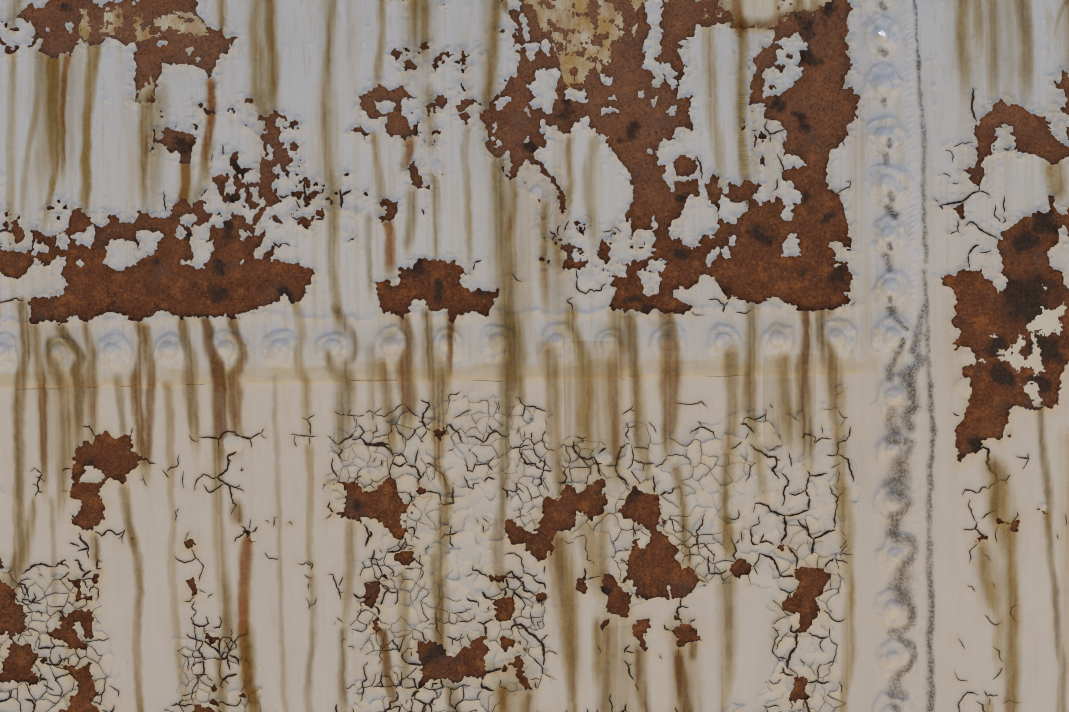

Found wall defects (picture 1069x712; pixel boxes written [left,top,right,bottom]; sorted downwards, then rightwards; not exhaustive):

peeling [0,0,238,164]
peeling [0,110,338,325]
peeling [350,0,860,323]
peeling [964,70,1069,186]
corrosion [212,355,225,391]
peeling [939,195,1069,462]
crack [30,468,70,496]
crack [0,529,133,712]
peeling [70,431,143,531]
peeling [324,477,426,566]
crack [141,392,854,712]
peeling [504,478,705,651]